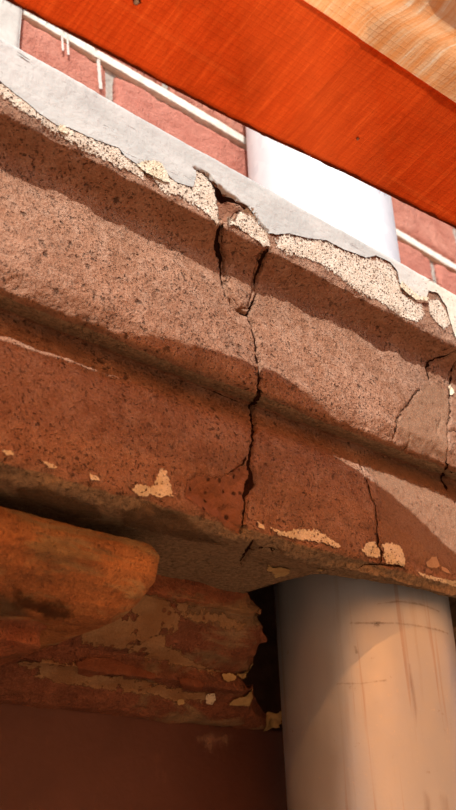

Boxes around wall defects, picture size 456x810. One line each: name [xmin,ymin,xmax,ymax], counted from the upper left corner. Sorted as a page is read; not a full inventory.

peeling [0,84,450,329]
crack [198,172,255,221]
crack [214,224,223,287]
crack [201,249,277,565]
crack [394,350,456,492]
peeling [132,468,174,498]
peeling [258,522,341,548]
crack [356,463,403,569]
peeling [362,542,405,567]
peeling [81,594,253,682]
peeling [18,658,216,705]
peeling [230,689,253,706]